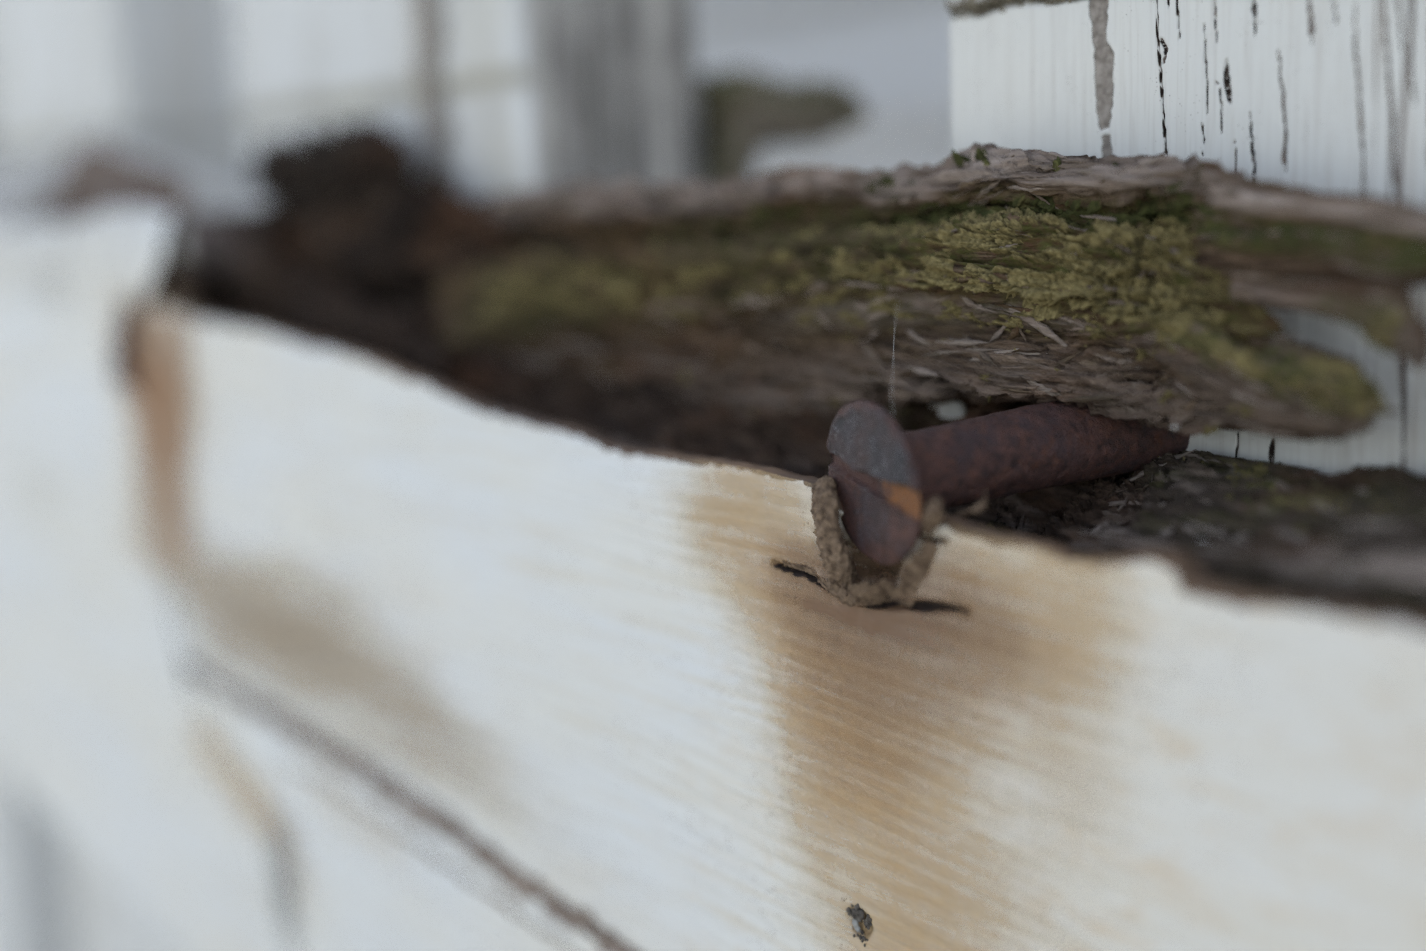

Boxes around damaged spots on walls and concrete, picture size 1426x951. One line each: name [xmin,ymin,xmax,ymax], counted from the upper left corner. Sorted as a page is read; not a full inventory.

peeling [1089,0,1114,158]
crack [1156,0,1287,179]
crack [1307,0,1415,201]
crack [1235,433,1275,462]
crack [1398,357,1406,469]
peeling [777,536,938,607]